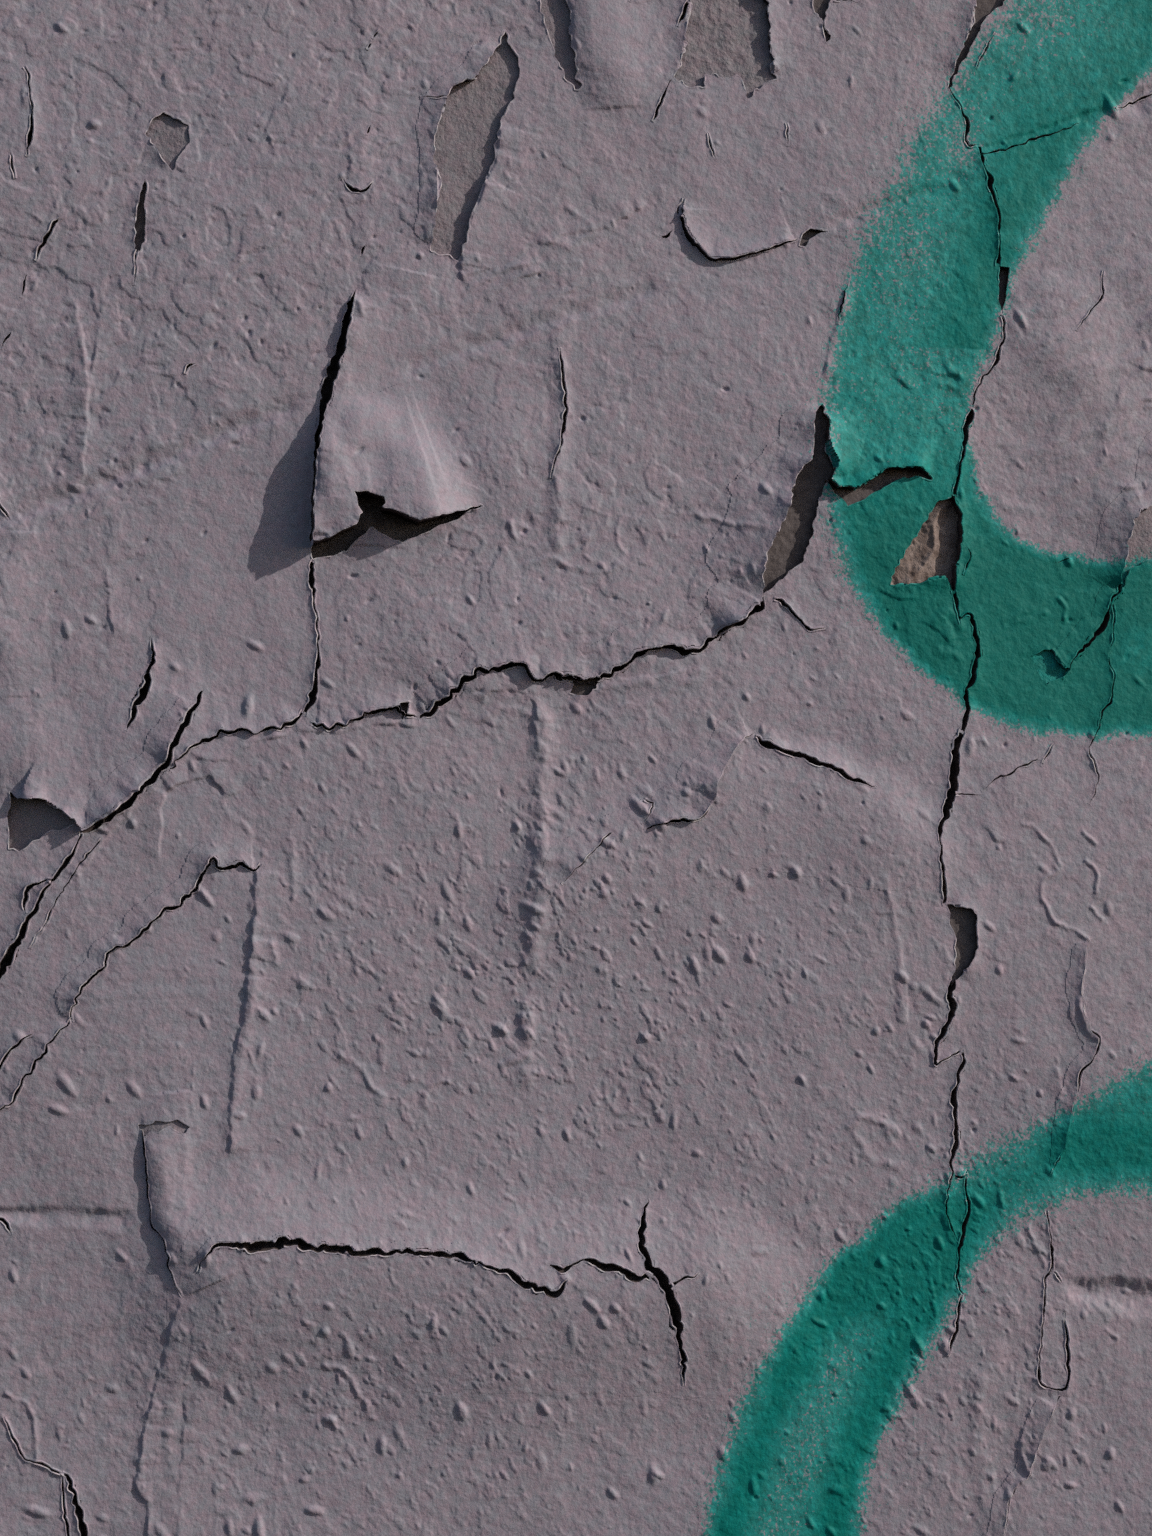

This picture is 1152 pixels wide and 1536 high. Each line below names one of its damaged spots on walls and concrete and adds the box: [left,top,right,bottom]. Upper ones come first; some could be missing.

peeling [415,29,521,262]
peeling [651,0,786,123]
peeling [309,355,484,561]
crack [0,243,826,982]
peeling [706,403,934,628]
spalling [889,496,965,624]
peeling [5,765,109,853]
crack [0,840,263,1113]
crack [139,1129,701,1386]
crack [932,980,972,1357]
crack [983,936,1102,1536]
crack [2,1417,89,1536]